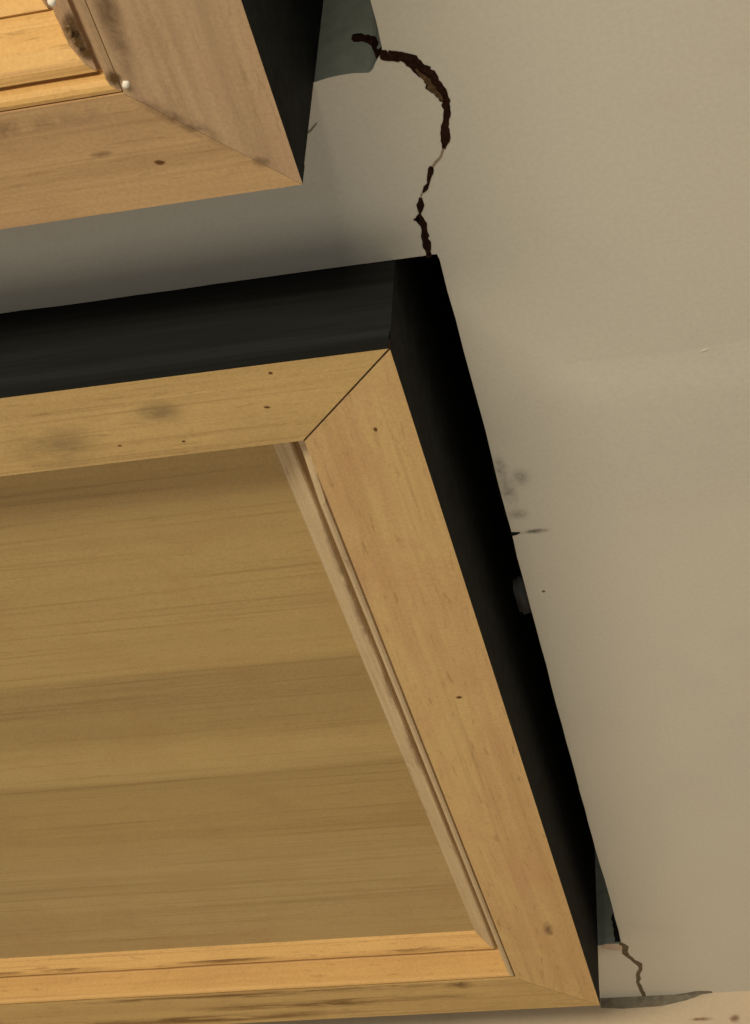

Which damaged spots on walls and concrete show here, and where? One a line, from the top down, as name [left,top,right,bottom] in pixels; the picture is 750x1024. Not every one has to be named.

crack [351,33,451,258]
crack [600,912,712,1009]